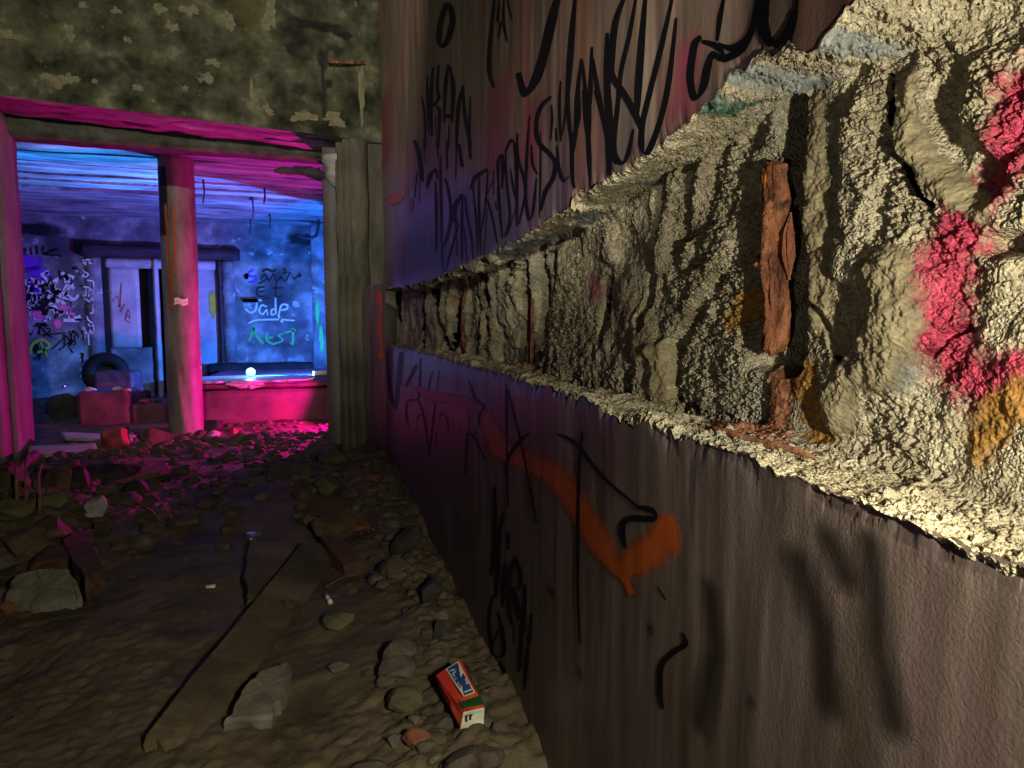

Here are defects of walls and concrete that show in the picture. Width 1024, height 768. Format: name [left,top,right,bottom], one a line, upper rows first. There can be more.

crack [886,73,896,127]
crack [898,161,936,208]
spalling [384,0,1024,578]
rust [724,159,796,356]
rust [704,354,835,459]